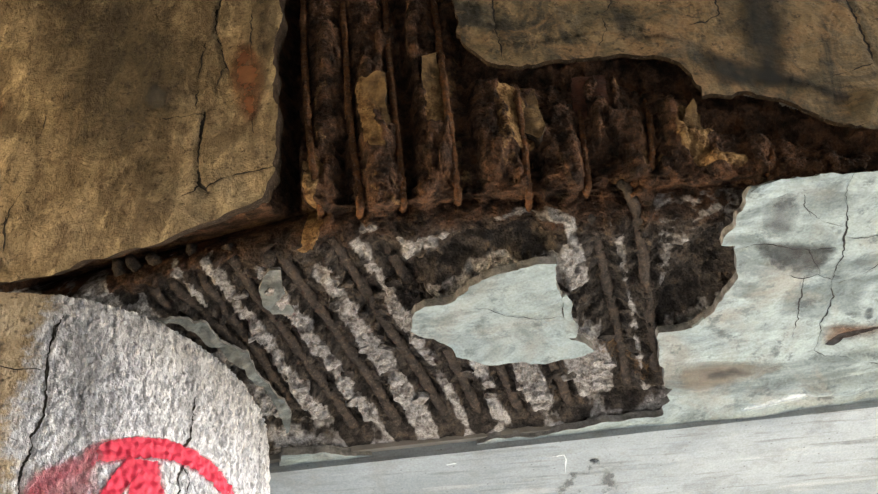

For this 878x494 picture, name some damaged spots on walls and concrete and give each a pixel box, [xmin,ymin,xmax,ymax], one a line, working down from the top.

crack [169,0,273,197]
spalling [0,0,734,455]
spalling [653,59,878,302]
crack [789,174,878,357]
crack [825,0,875,79]
crack [0,315,64,494]